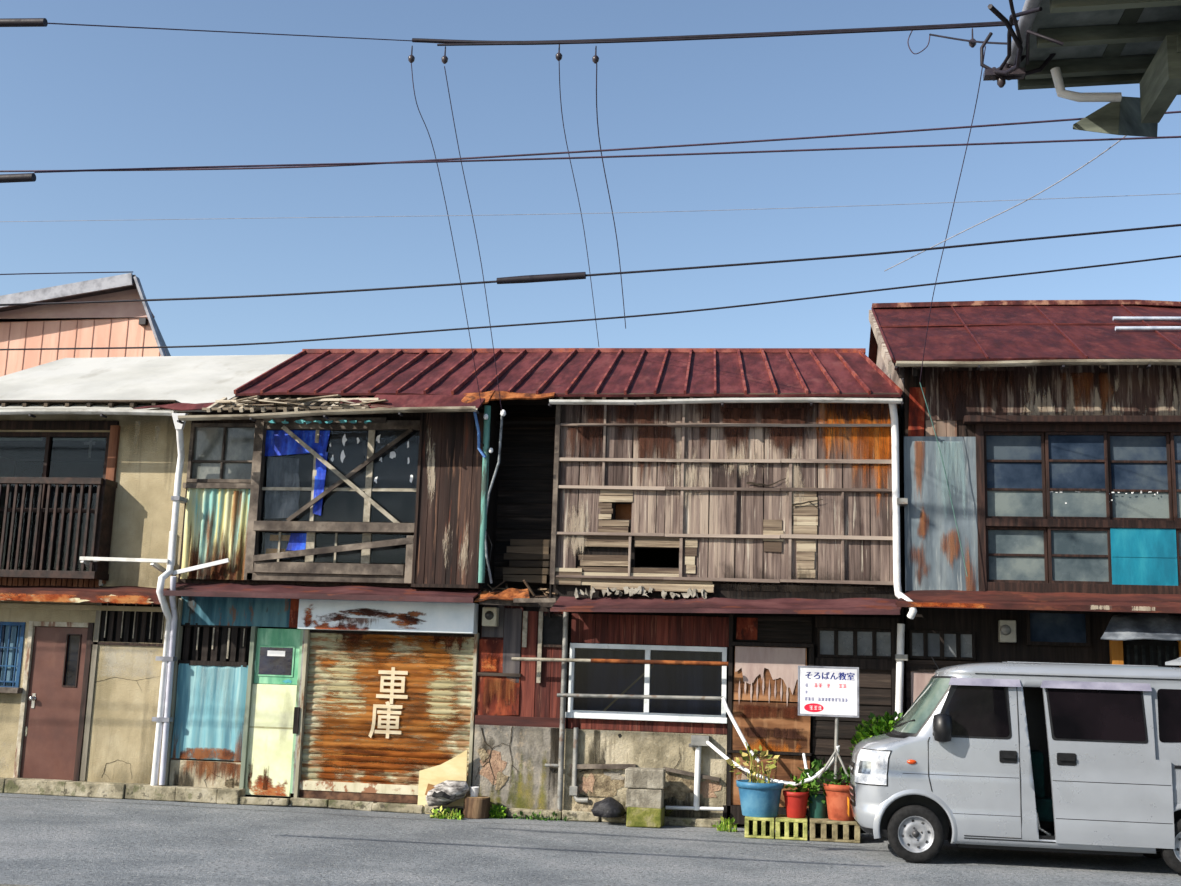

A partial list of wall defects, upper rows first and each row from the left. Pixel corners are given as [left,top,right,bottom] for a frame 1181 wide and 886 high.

water stain [938,371,1014,415]
water stain [567,404,676,481]
water stain [692,403,824,468]
corrosion [820,403,891,500]
corrosion [915,441,925,494]
corrosion [0,593,75,602]
corrosion [95,595,149,604]
corrosion [188,490,248,580]
corrosion [913,511,929,583]
corrosion [912,530,985,608]
corrosion [303,608,466,795]
corrosion [173,732,242,787]